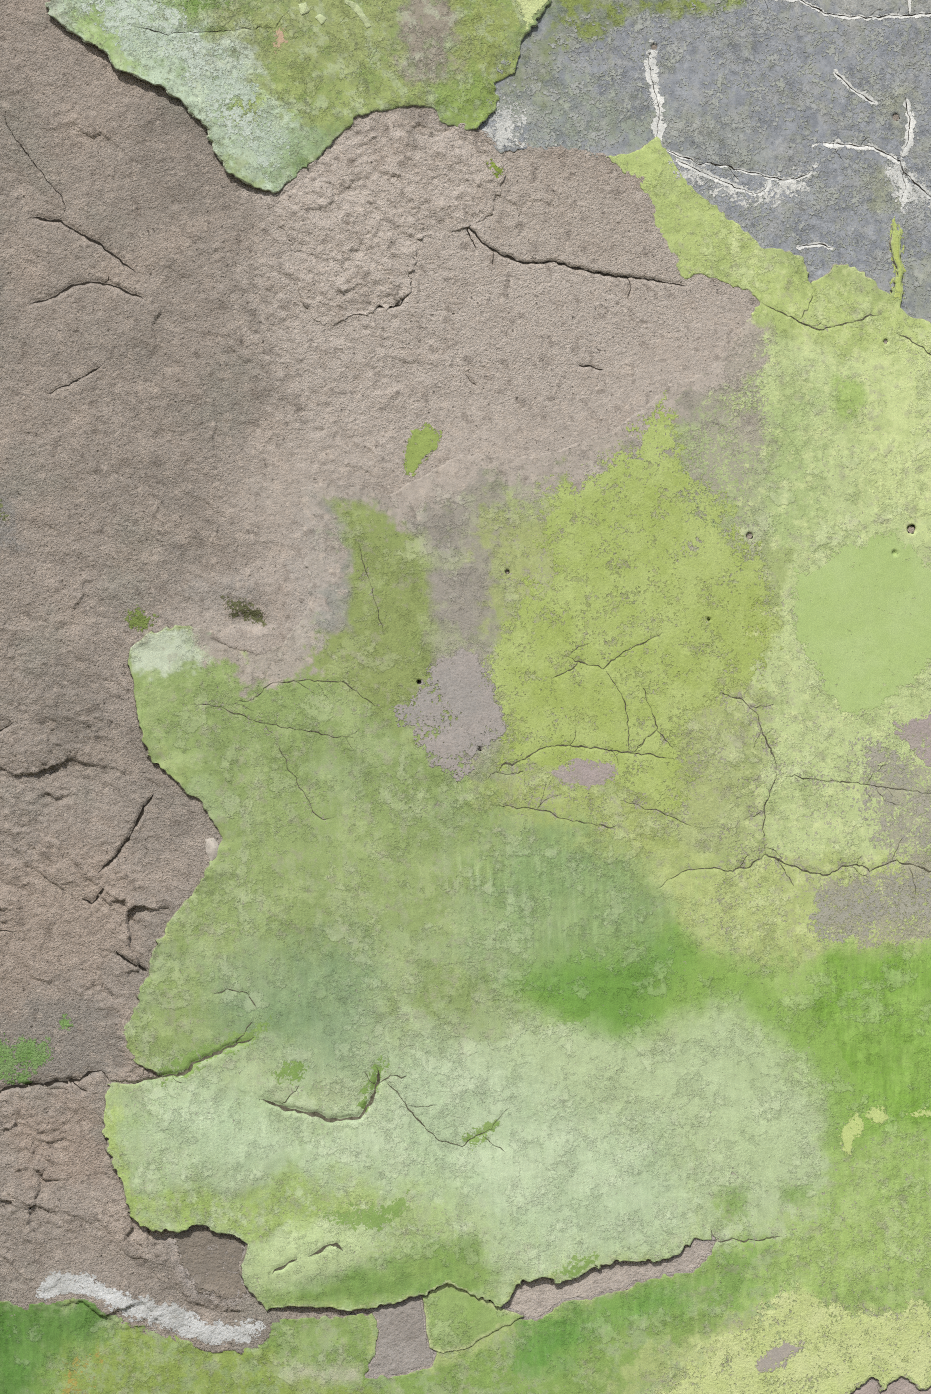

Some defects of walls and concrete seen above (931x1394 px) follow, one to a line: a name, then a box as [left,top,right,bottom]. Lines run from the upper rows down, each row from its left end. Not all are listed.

crack [765,0,931,21]
crack [0,111,147,304]
peeling [45,0,931,326]
crack [467,227,684,296]
crack [642,39,931,214]
peeling [391,390,931,824]
crack [82,792,154,904]
flaking render [205,837,219,861]
crack [656,692,931,894]
crack [0,988,256,1093]
spalling [88,1208,252,1315]
peeling [657,1276,931,1394]